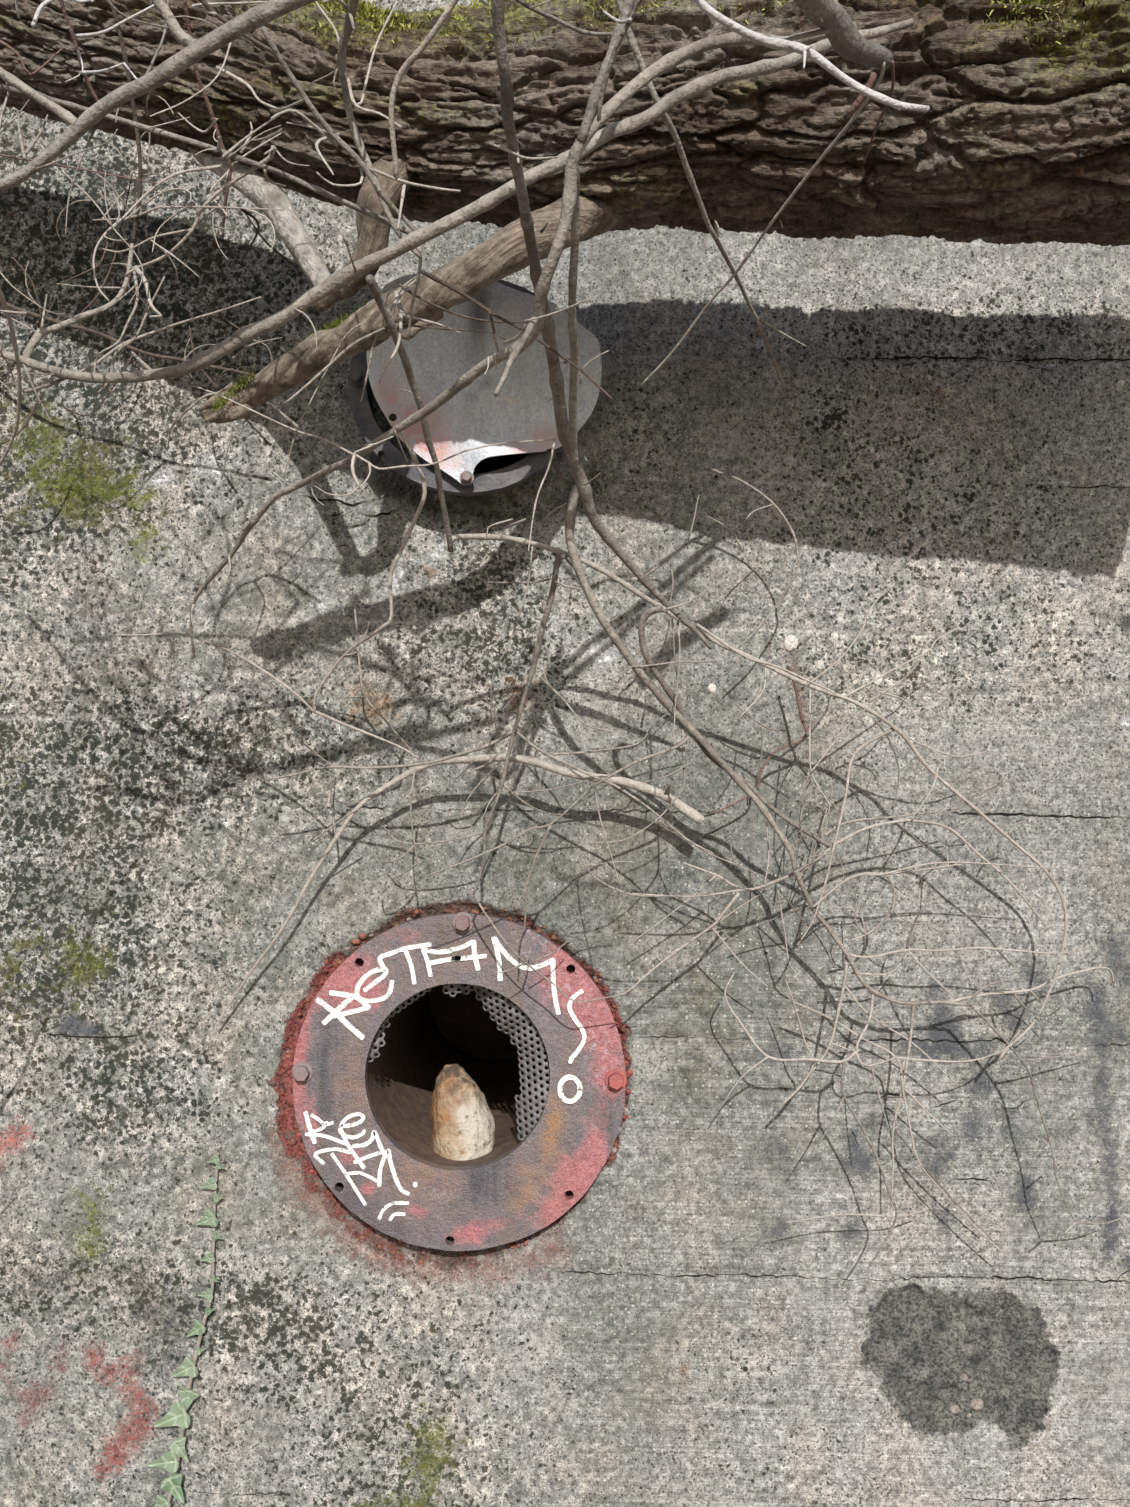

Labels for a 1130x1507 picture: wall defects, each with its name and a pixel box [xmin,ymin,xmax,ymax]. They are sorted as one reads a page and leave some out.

crack [839,356,1130,371]
crack [951,810,1129,818]
crack [556,1270,1130,1283]